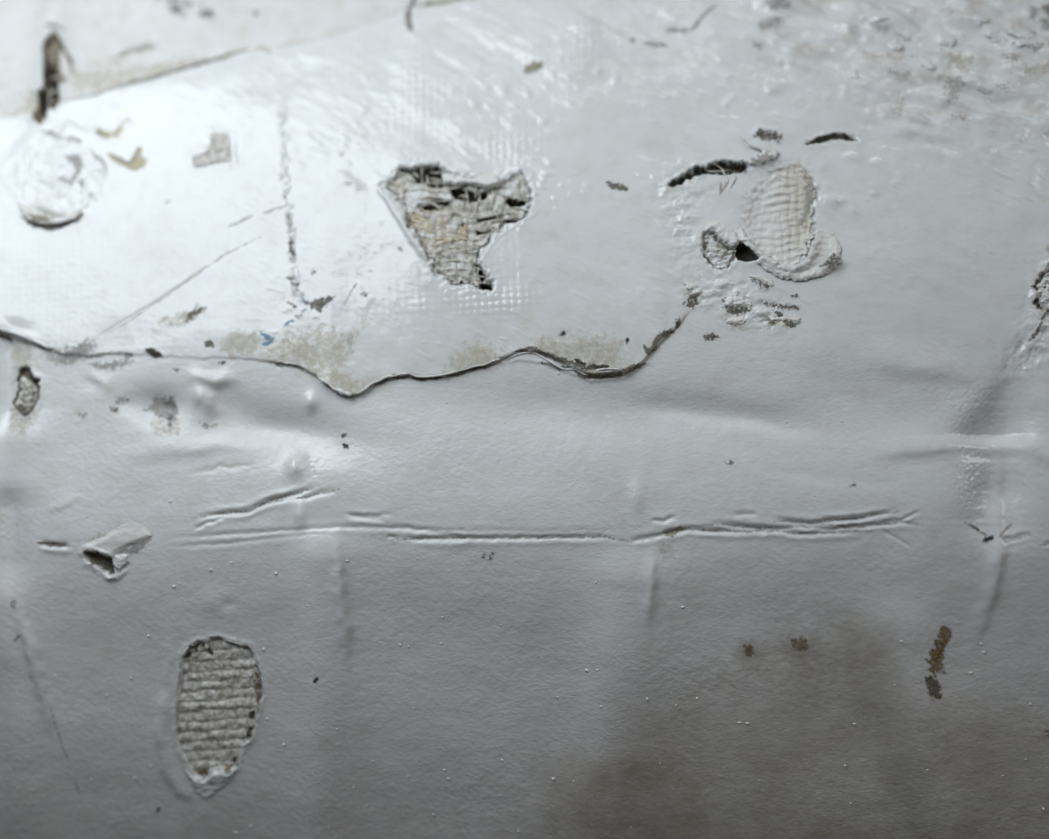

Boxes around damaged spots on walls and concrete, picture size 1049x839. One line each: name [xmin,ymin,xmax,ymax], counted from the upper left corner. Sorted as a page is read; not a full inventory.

spalling [390,179,490,211]
spalling [475,174,529,267]
spalling [702,221,740,270]
spalling [1029,271,1049,341]
crack [202,489,333,517]
crack [405,533,623,541]
crack [656,512,915,537]
peeling [114,554,130,572]
corrosion [925,626,952,700]
peeling [176,637,264,799]